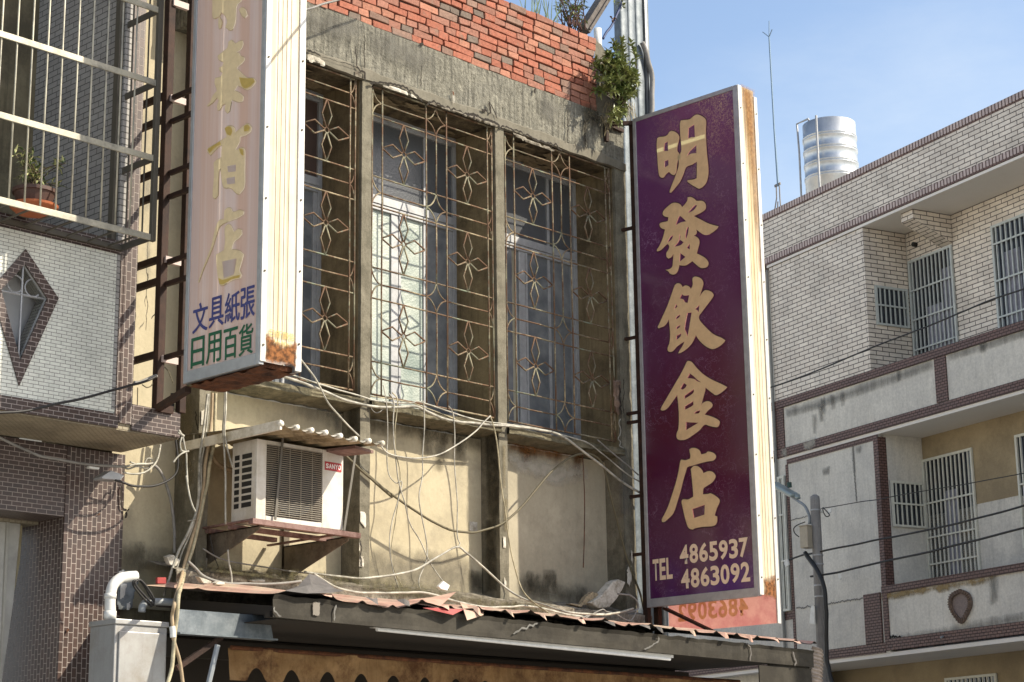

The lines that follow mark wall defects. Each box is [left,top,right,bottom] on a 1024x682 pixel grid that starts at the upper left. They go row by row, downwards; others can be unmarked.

water stain [567,106,600,149]
water stain [524,575,584,603]